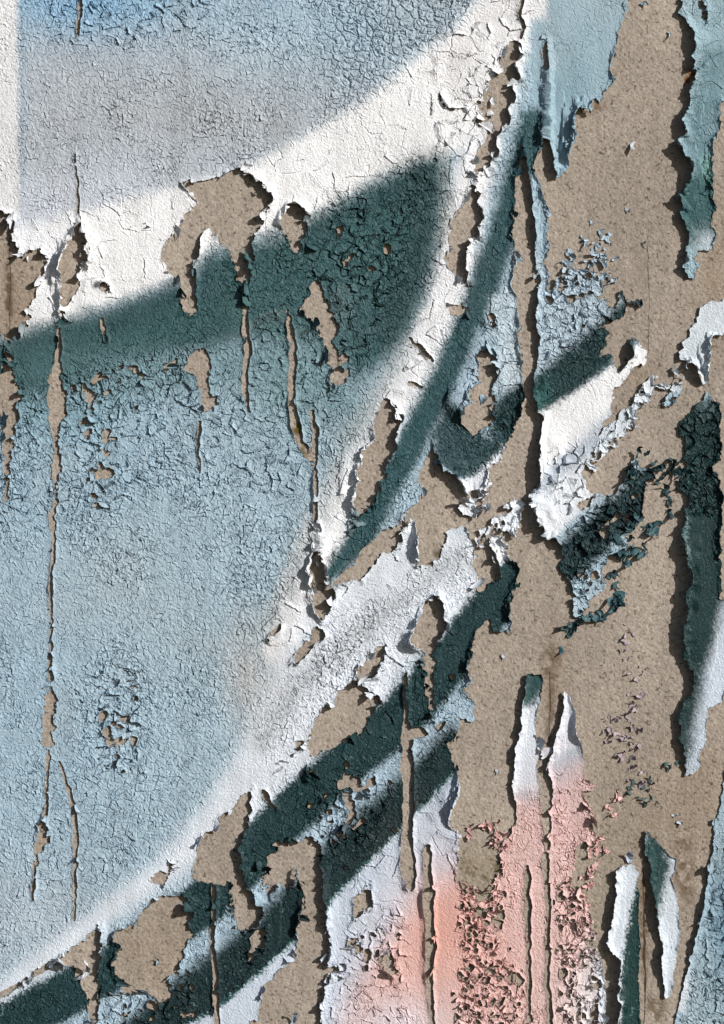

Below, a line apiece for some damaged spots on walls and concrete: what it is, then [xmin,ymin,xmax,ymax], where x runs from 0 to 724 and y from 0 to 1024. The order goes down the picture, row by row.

crack [438,93,463,111]
peeling [160,161,273,316]
peeling [0,211,90,512]
peeling [75,348,218,480]
crack [286,309,321,523]
crack [408,337,434,363]
peeling [274,0,724,1024]
crack [31,326,81,921]
peeling [100,715,137,769]
peeling [0,791,365,1024]
crack [210,884,220,1024]
crack [396,672,437,1024]